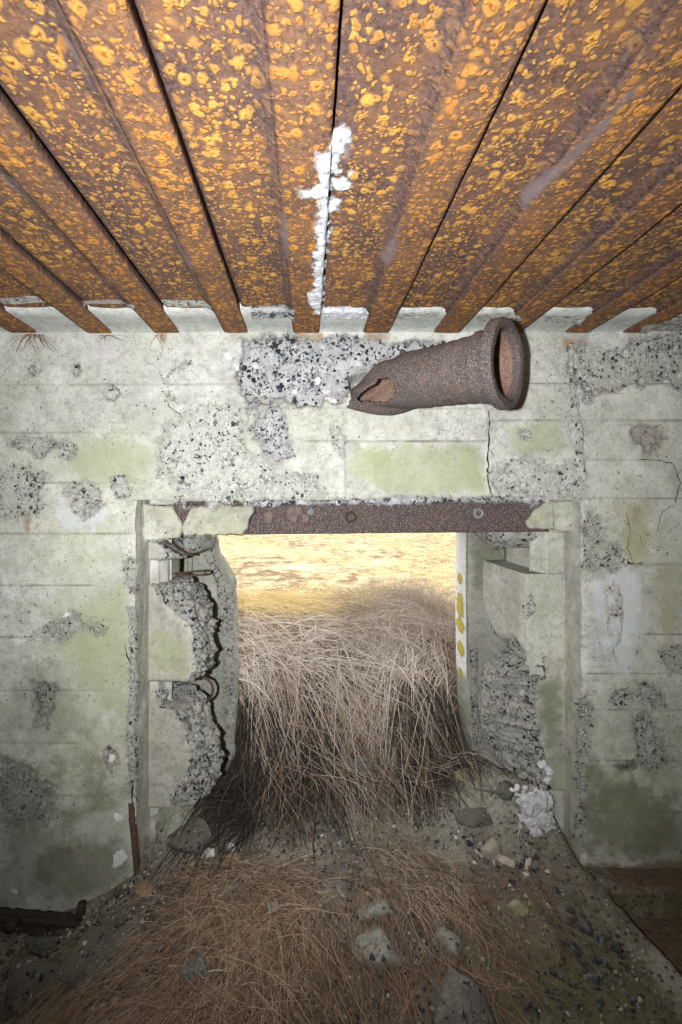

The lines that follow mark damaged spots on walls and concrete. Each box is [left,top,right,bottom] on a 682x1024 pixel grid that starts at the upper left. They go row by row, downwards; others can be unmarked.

damp [299,125,368,320]
spalling [0,415,85,525]
spalling [142,305,601,510]
spalling [567,316,682,407]
crack [613,451,681,584]
spalling [162,549,236,803]
spalling [468,641,544,777]